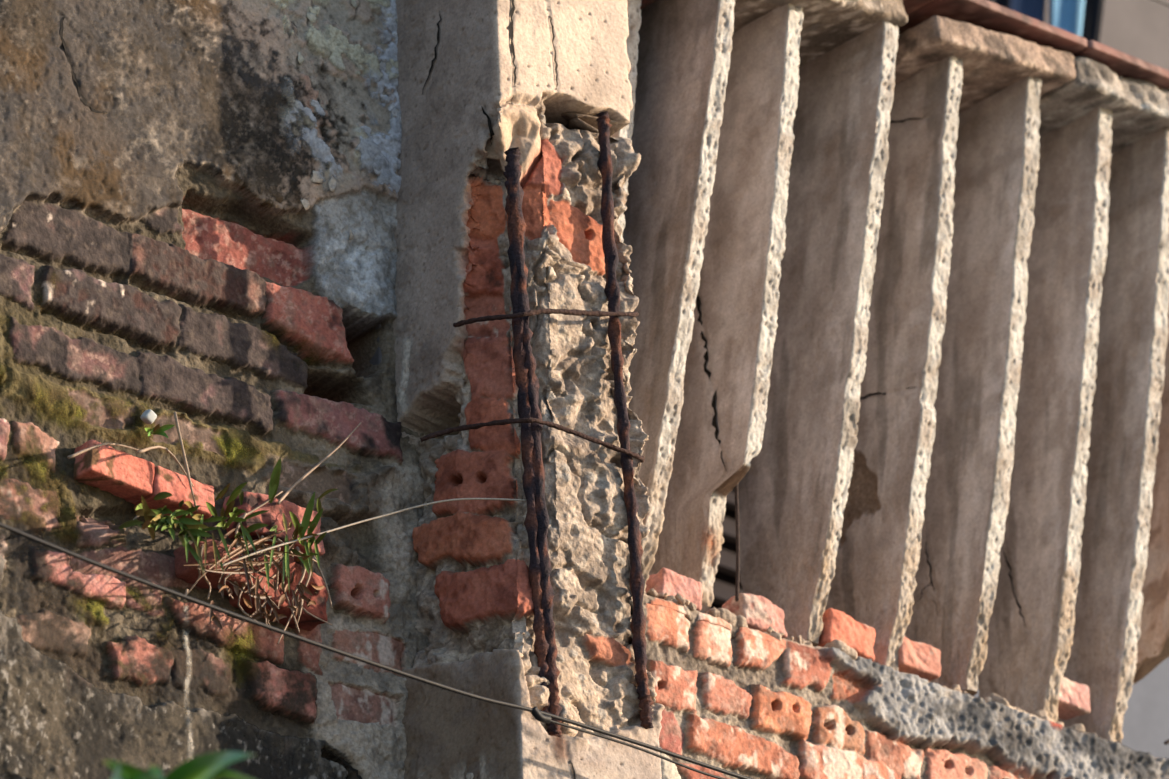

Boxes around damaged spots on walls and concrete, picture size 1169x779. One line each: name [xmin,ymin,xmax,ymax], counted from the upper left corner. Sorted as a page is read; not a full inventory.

crack [60,17,106,113]
damp [0,0,352,231]
crack [422,13,442,95]
crack [481,0,517,145]
crack [550,16,558,89]
spalling [0,0,650,779]
crack [696,293,726,472]
spalling [837,449,882,550]
spalling [642,594,1033,779]